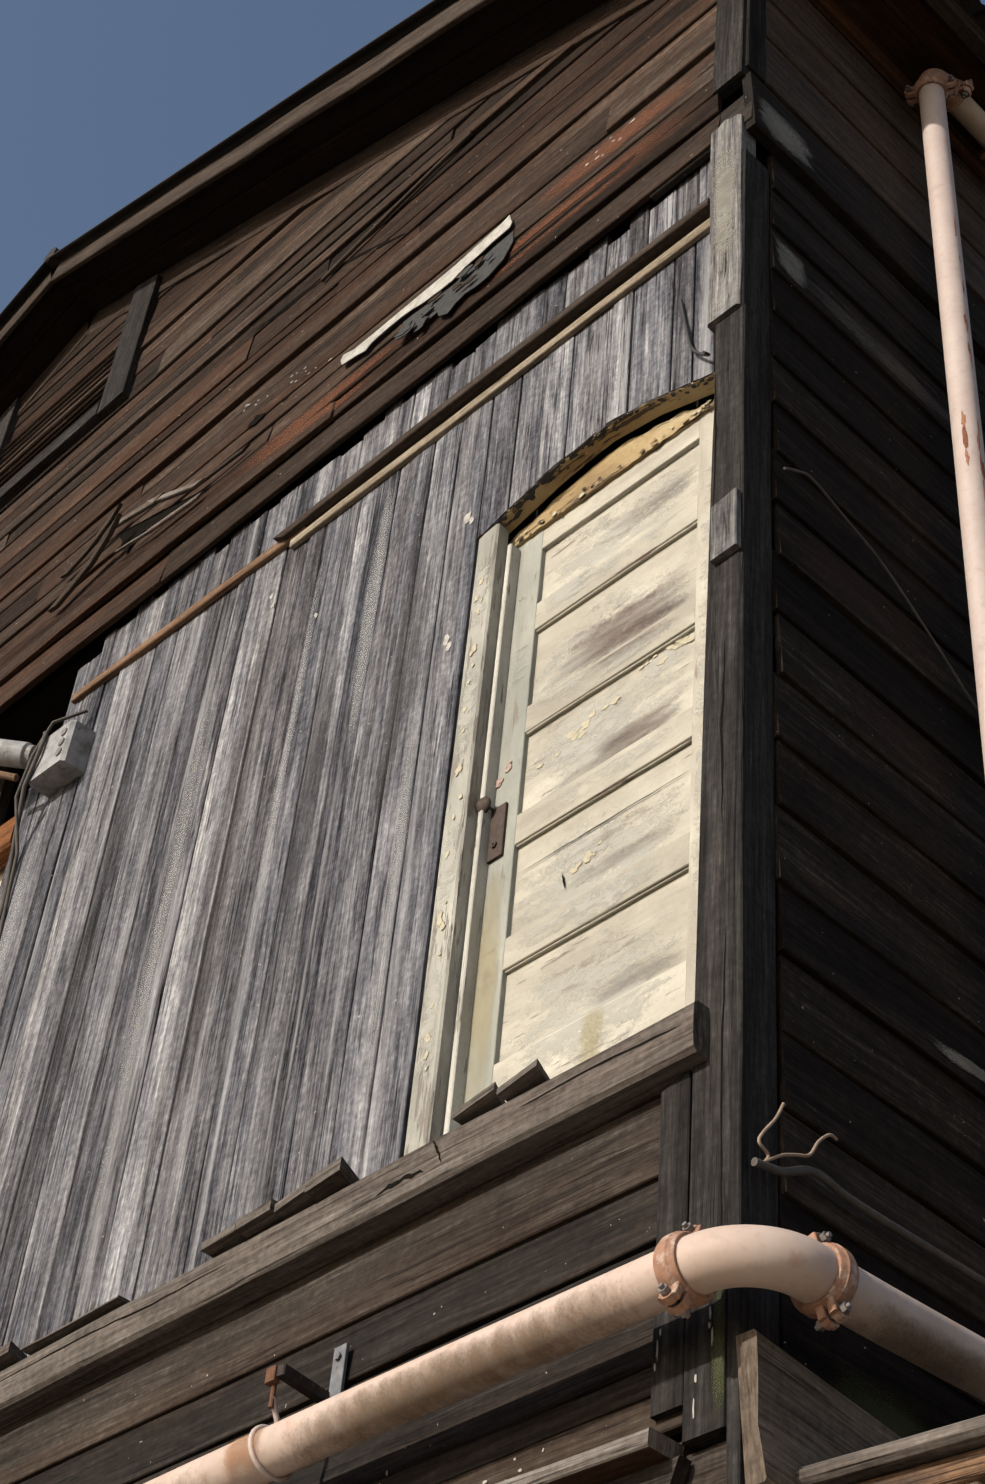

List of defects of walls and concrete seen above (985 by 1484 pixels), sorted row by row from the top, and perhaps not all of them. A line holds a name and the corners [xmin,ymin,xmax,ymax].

peeling [341,215,514,365]